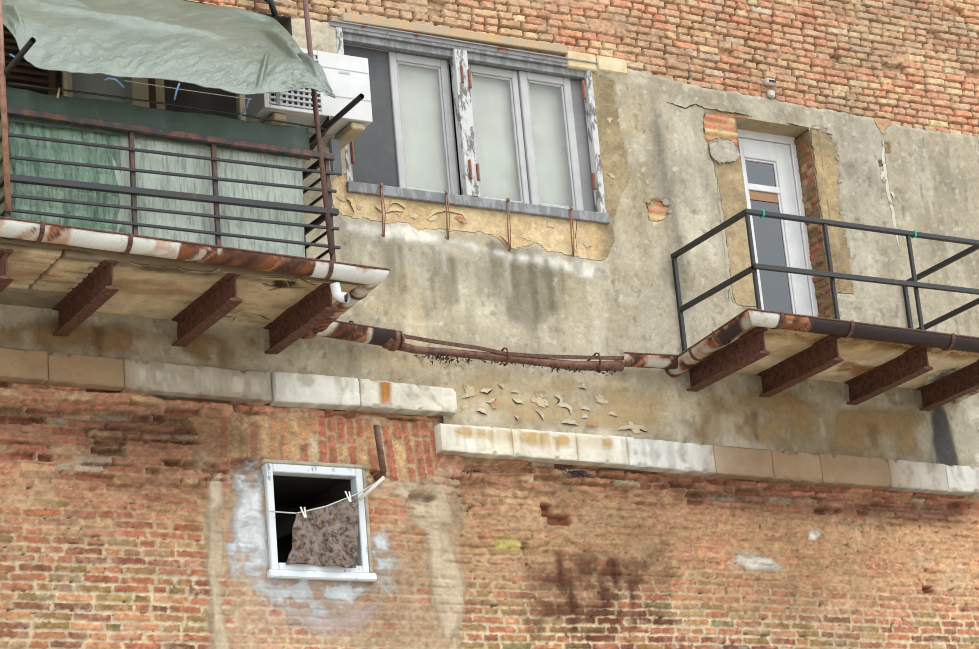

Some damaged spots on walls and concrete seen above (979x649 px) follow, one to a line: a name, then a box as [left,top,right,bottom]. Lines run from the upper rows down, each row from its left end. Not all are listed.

peeling [331,72,631,260]
spalling [643,198,672,222]
spalling [703,112,756,307]
peeling [461,383,655,435]
rust [839,363,875,376]
leakage [235,487,265,568]